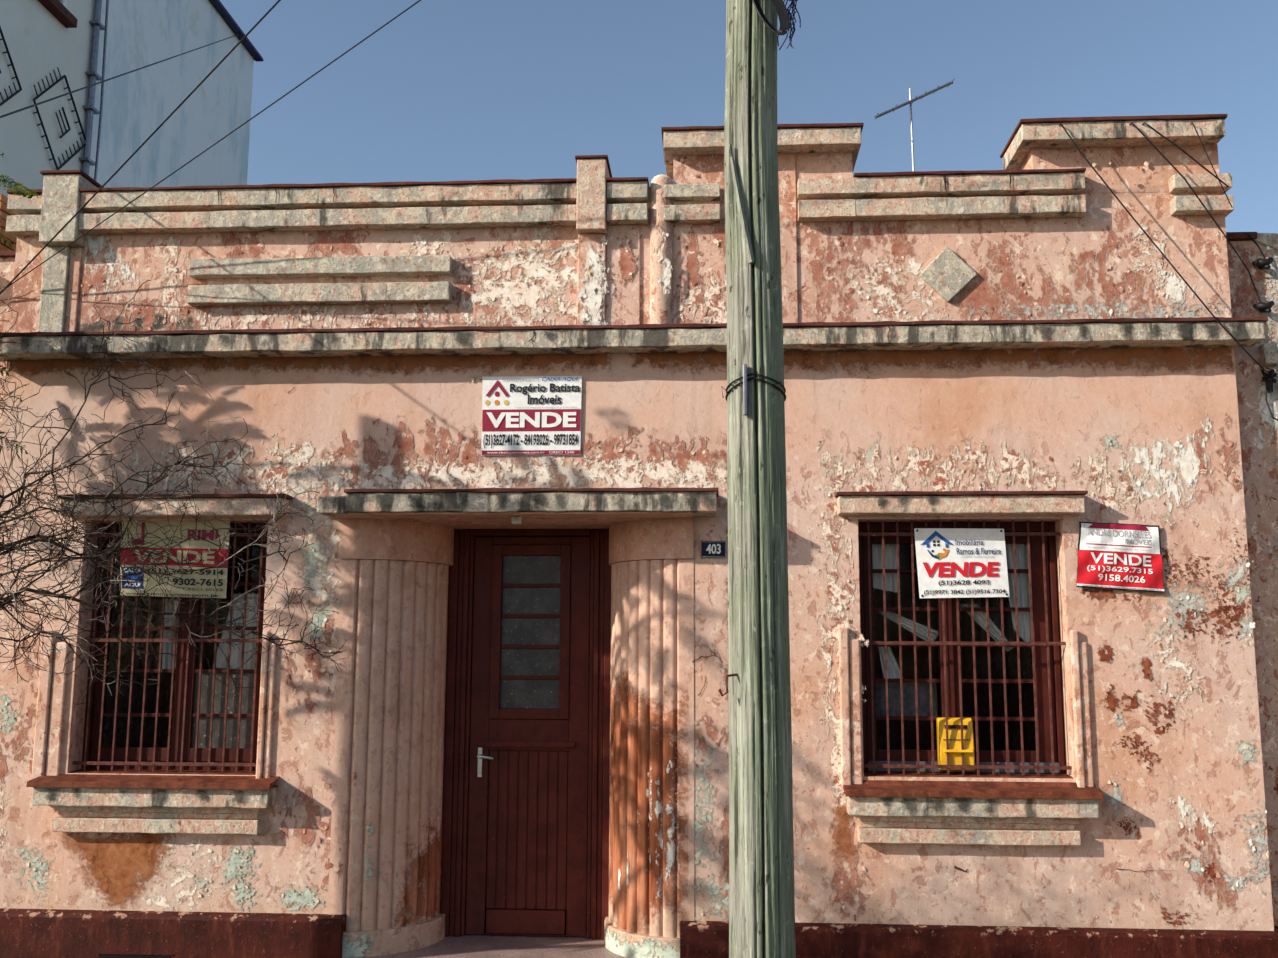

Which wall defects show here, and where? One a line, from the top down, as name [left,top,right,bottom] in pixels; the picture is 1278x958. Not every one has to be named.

peeling [78,225,641,331]
peeling [651,220,727,324]